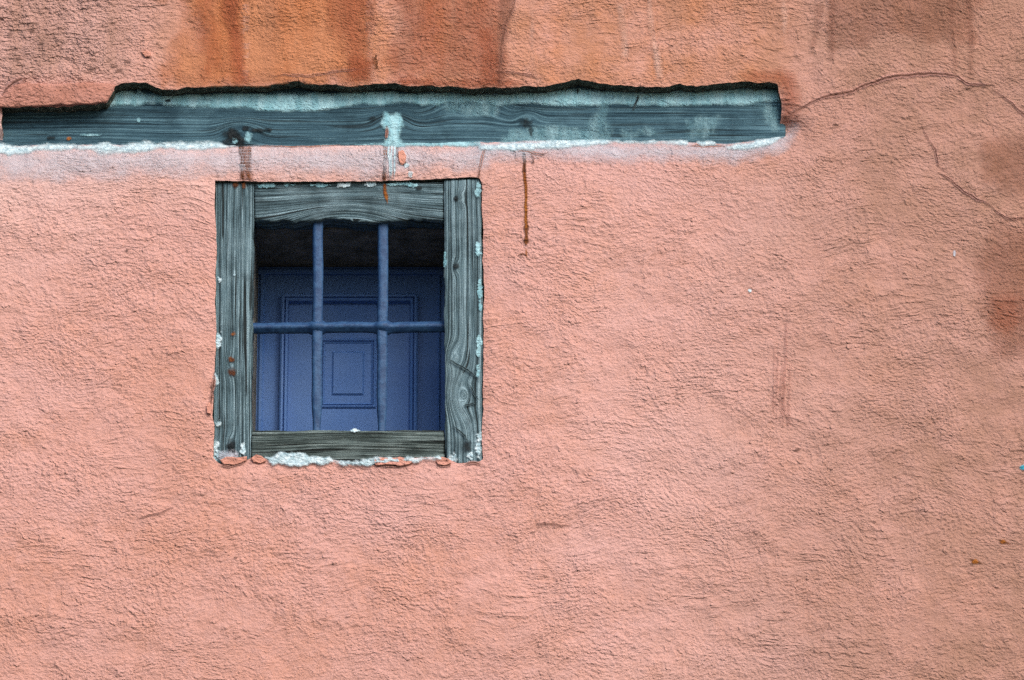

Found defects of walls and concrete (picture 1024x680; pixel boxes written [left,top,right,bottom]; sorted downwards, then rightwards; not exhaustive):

crack [786,71,1024,118]
corrosion [382,145,398,204]
corrosion [519,140,529,257]
crack [932,146,1024,220]
flaking render [213,441,266,467]
flaking render [374,457,412,467]